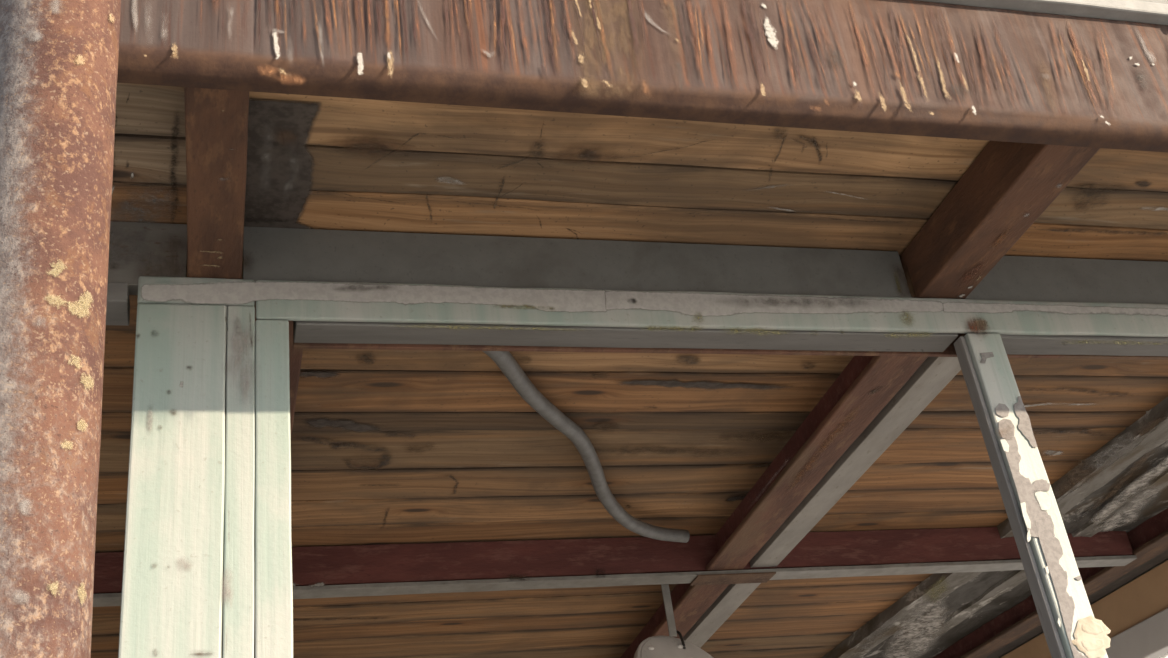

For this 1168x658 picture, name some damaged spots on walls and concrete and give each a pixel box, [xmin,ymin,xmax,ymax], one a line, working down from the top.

rust [258,0,420,82]
rust [445,0,647,89]
rust [664,0,770,96]
rust [778,0,862,101]
rust [851,11,1032,114]
rust [1051,22,1114,105]
water stain [244,99,320,229]
rust [968,319,986,333]
peeling [995,396,1111,658]
water stain [1077,445,1168,530]
water stain [861,581,945,658]